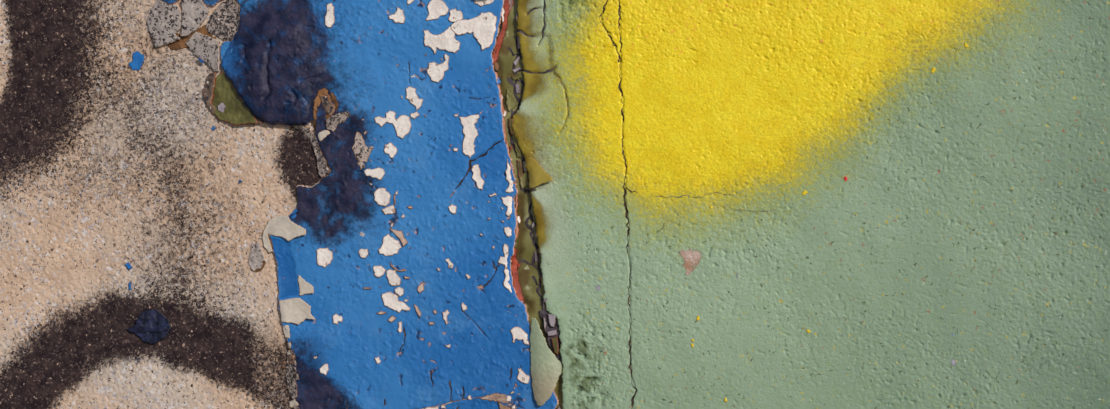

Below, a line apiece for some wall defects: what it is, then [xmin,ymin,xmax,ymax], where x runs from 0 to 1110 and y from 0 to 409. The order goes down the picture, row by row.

peeling [128,0,263,131]
spalling [325,3,335,28]
spalling [388,0,414,24]
spalling [424,0,519,117]
peeling [248,209,306,273]
spalling [290,86,467,333]
spalling [450,113,521,293]
peeling [526,157,553,188]
crack [599,0,779,408]
peeling [279,275,315,409]
peeling [467,277,563,409]